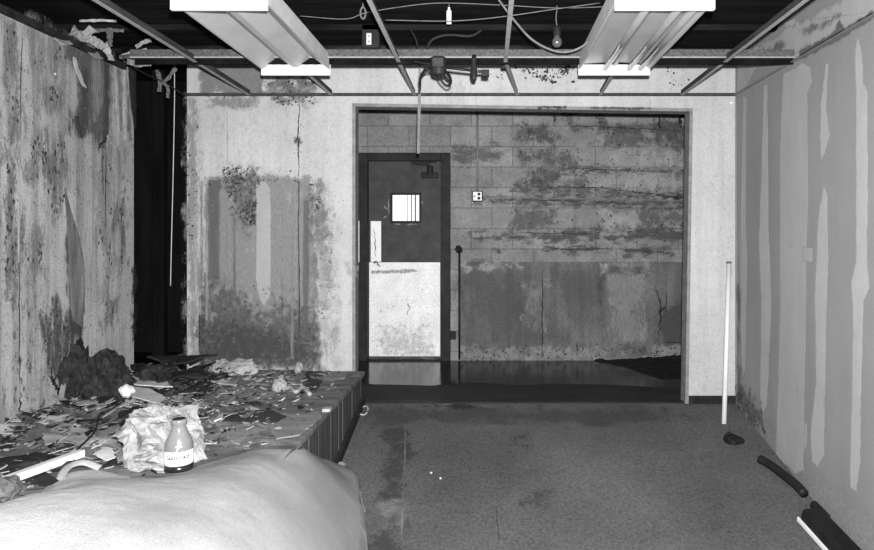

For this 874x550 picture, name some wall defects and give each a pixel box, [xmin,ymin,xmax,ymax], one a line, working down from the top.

leakage [1,14,132,394]
leakage [194,167,334,371]
crack [294,96,305,343]
crack [646,288,682,346]